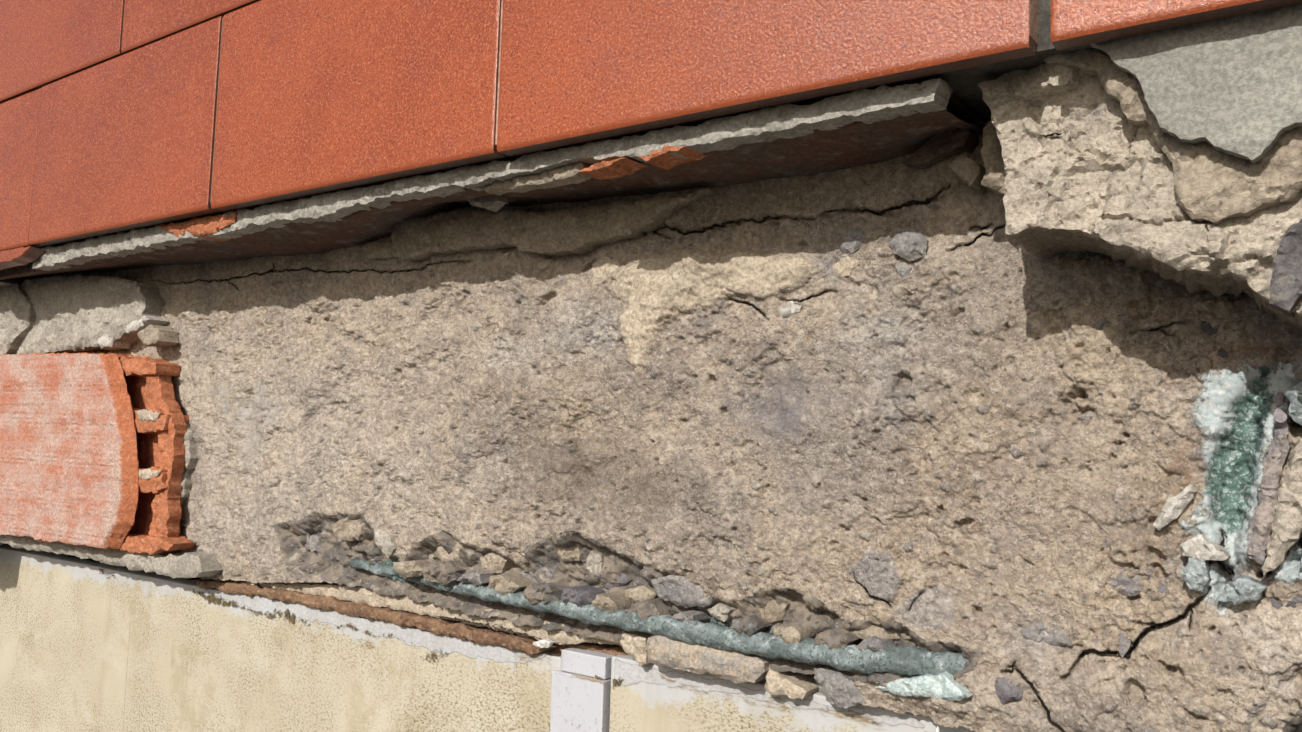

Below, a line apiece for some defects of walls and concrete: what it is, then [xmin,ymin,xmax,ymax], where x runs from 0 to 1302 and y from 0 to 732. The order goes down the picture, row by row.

peeling [475,161,592,196]
spalling [0,246,45,270]
flaking render [591,248,811,368]
flaking render [832,256,860,278]
leakage [1180,357,1302,615]
spalling [1180,382,1302,605]
spalling [271,514,983,680]
spalling [848,671,916,684]
crack [1002,532,1302,732]
spalling [1283,707,1302,732]